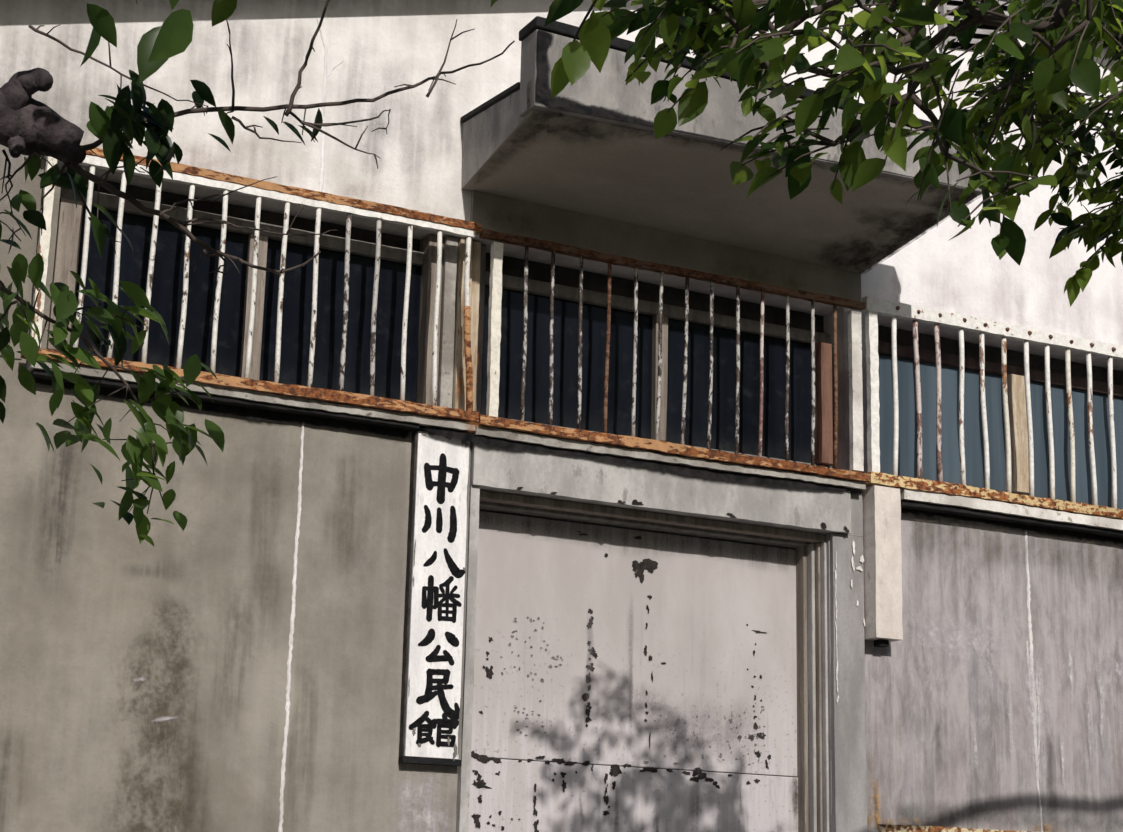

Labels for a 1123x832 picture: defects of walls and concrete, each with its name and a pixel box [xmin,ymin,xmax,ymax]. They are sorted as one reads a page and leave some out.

damp [501,29,654,161]
damp [667,130,774,151]
damp [824,182,975,265]
damp [901,508,1123,544]
peeling [632,559,658,629]
peeling [483,617,563,683]
peeling [582,609,598,727]
peeling [447,699,539,832]
peeling [518,645,771,824]